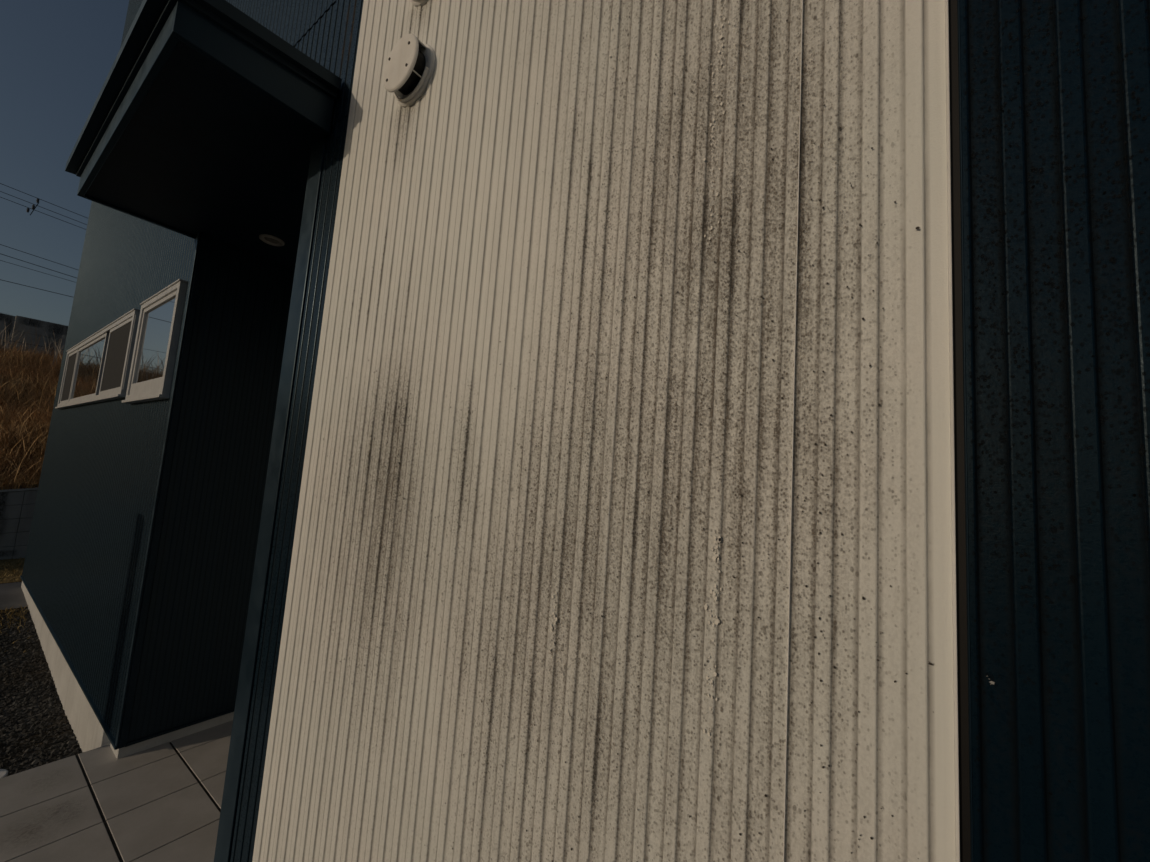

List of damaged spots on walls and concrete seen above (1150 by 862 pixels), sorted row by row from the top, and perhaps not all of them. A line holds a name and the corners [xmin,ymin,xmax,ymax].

leakage [314,361,478,711]
leakage [427,0,884,862]